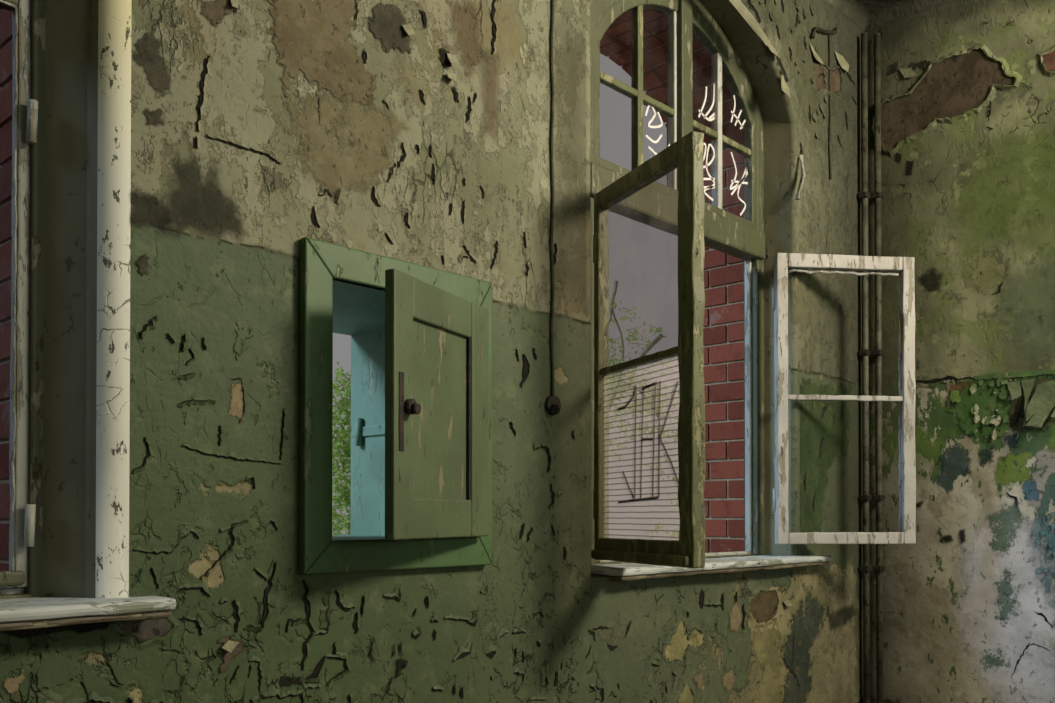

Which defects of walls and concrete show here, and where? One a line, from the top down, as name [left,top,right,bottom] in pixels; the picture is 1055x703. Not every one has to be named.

crack [195,53,282,164]
flaking render [729,0,857,139]
flaking render [868,44,1032,157]
crack [311,177,344,228]
crack [372,142,559,276]
crack [140,314,287,489]
peeling [936,378,1055,608]
crack [131,518,563,703]
peeling [745,585,792,703]
peeling [809,562,860,703]
water stain [942,515,1055,703]
peeling [994,568,1019,628]